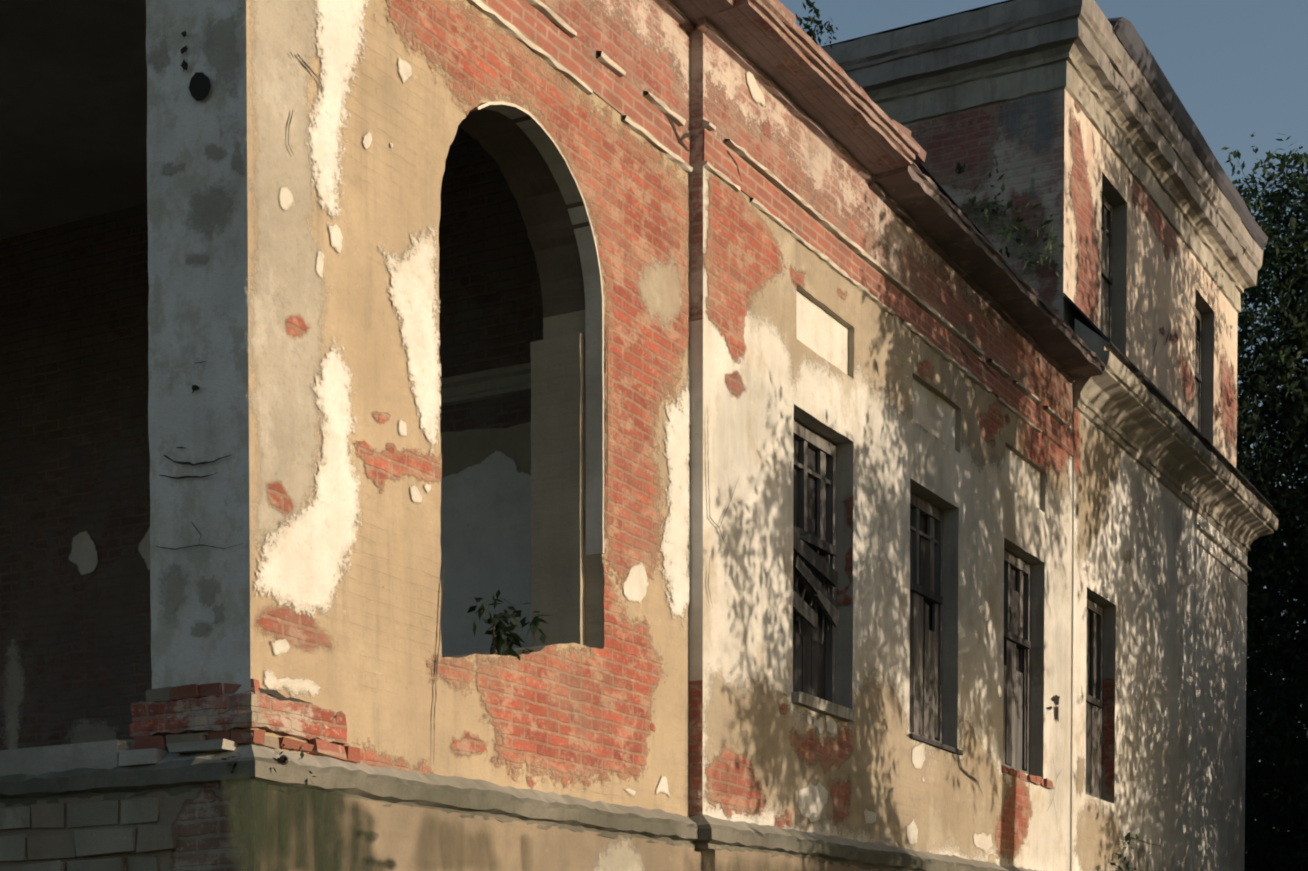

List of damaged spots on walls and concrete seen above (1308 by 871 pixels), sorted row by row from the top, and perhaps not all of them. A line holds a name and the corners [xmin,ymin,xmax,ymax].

flaking render [1128,178,1179,261]
flaking render [1159,327,1195,407]
flaking render [1214,354,1238,449]
flaking render [702,668,1033,865]
flaking render [1075,678,1122,871]